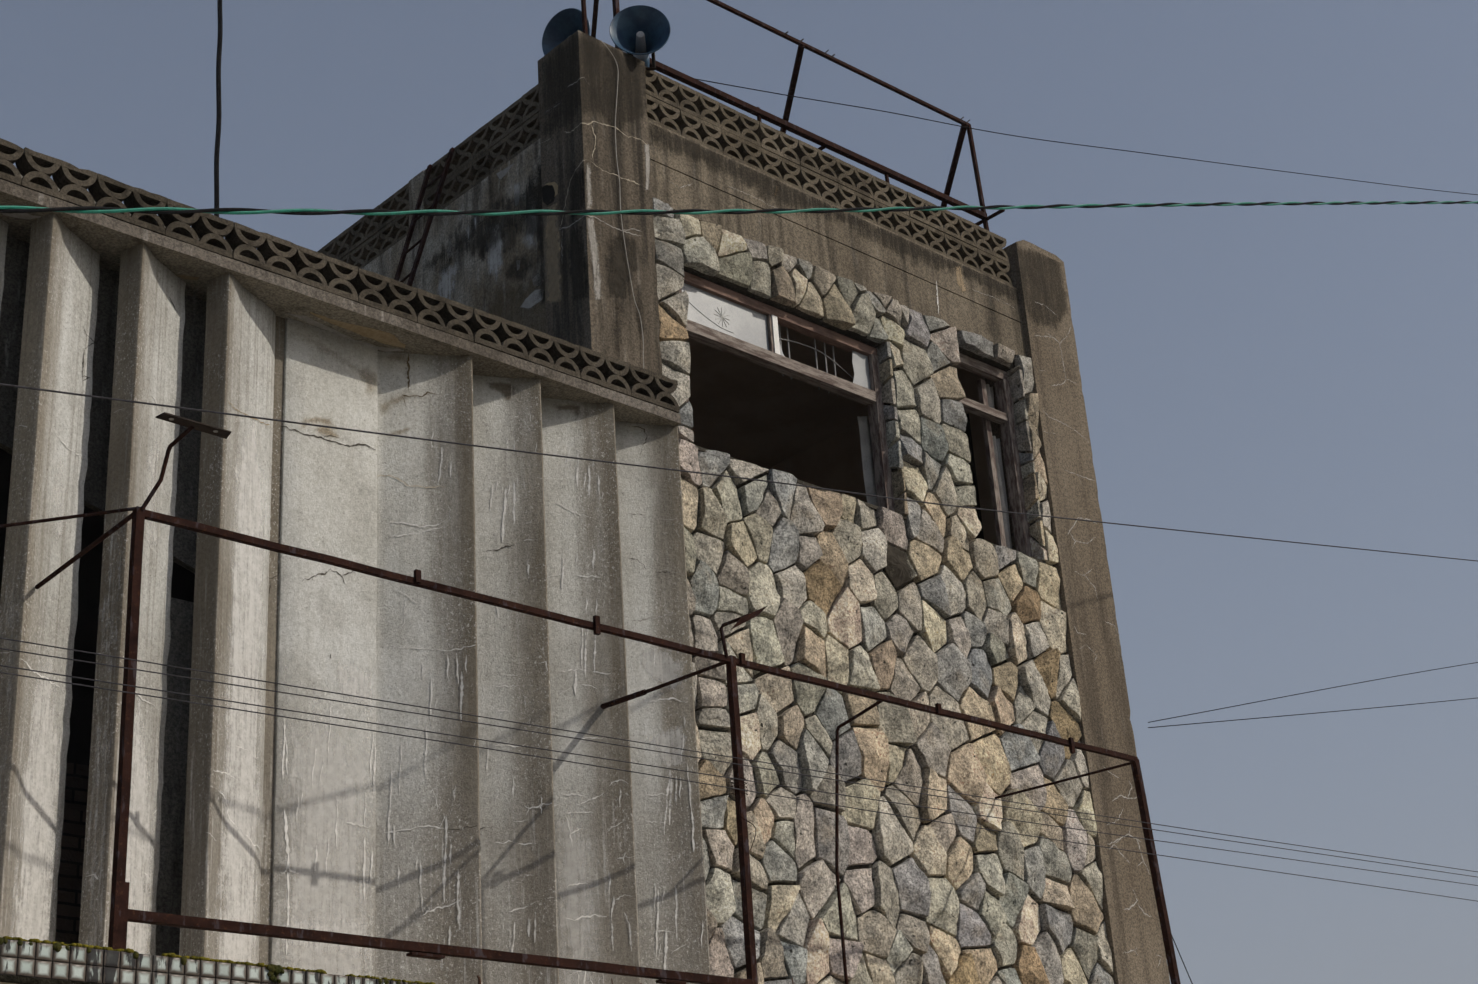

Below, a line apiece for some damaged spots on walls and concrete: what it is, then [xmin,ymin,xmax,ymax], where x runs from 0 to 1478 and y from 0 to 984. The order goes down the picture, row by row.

leakage [439,165,637,333]
crack [540,121,649,256]
leakage [542,34,1066,327]
leakage [217,425,266,963]
leakage [282,705,424,976]
leakage [415,653,467,775]
leakage [441,818,461,965]
crack [346,780,665,921]
leakage [503,919,536,952]
leakage [642,650,680,688]
leakage [646,878,678,970]
leakage [649,718,695,851]